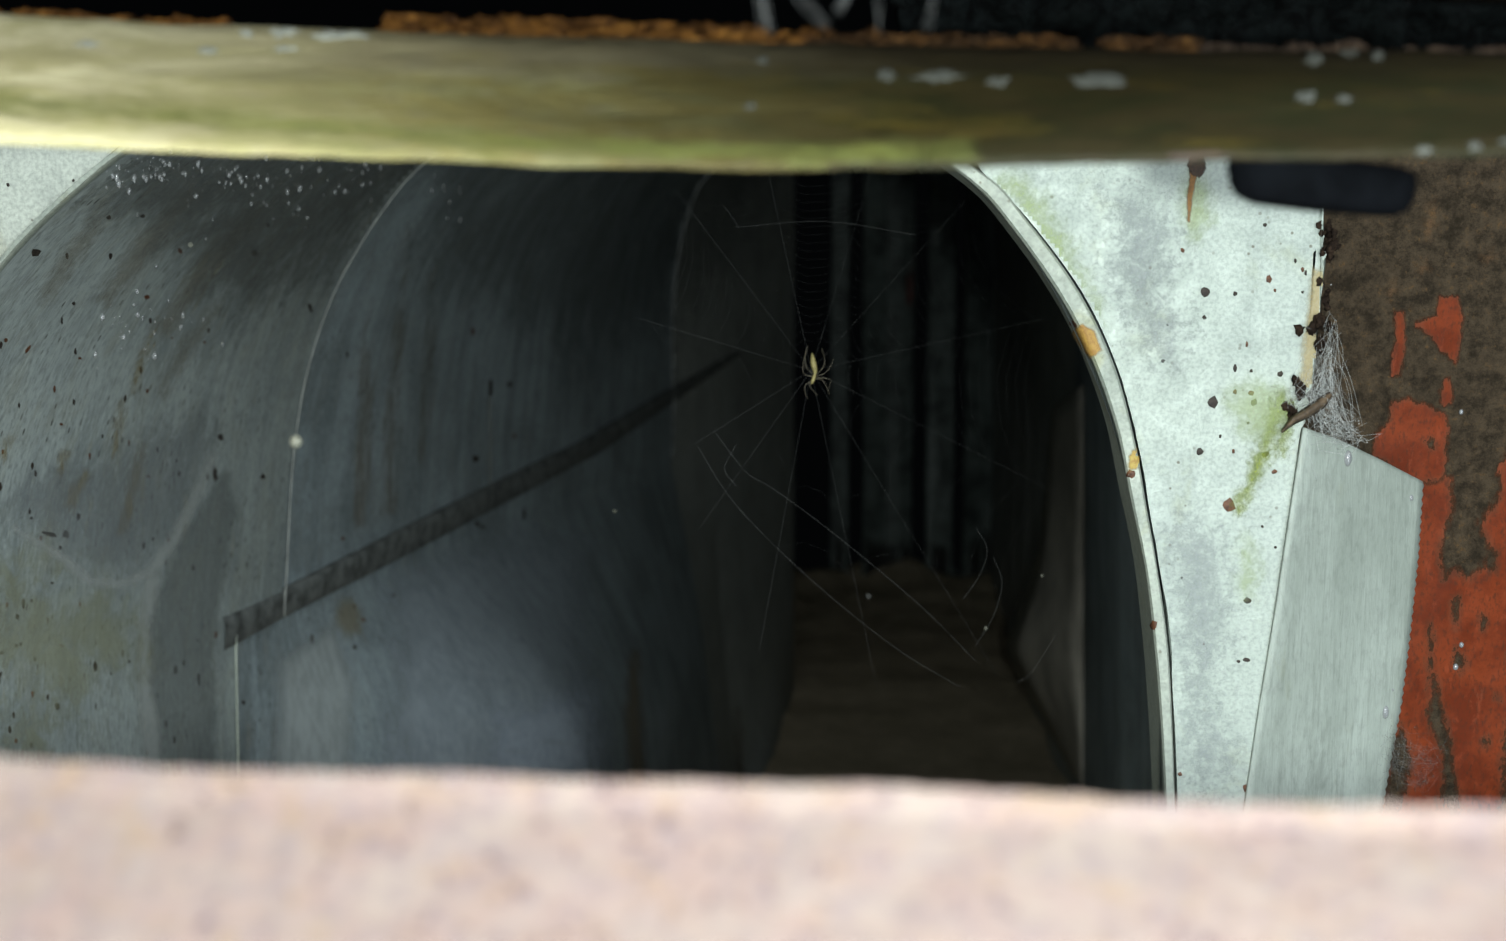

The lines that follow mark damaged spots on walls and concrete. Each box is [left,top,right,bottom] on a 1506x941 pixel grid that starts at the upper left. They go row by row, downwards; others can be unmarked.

water stain [1236,391,1293,512]